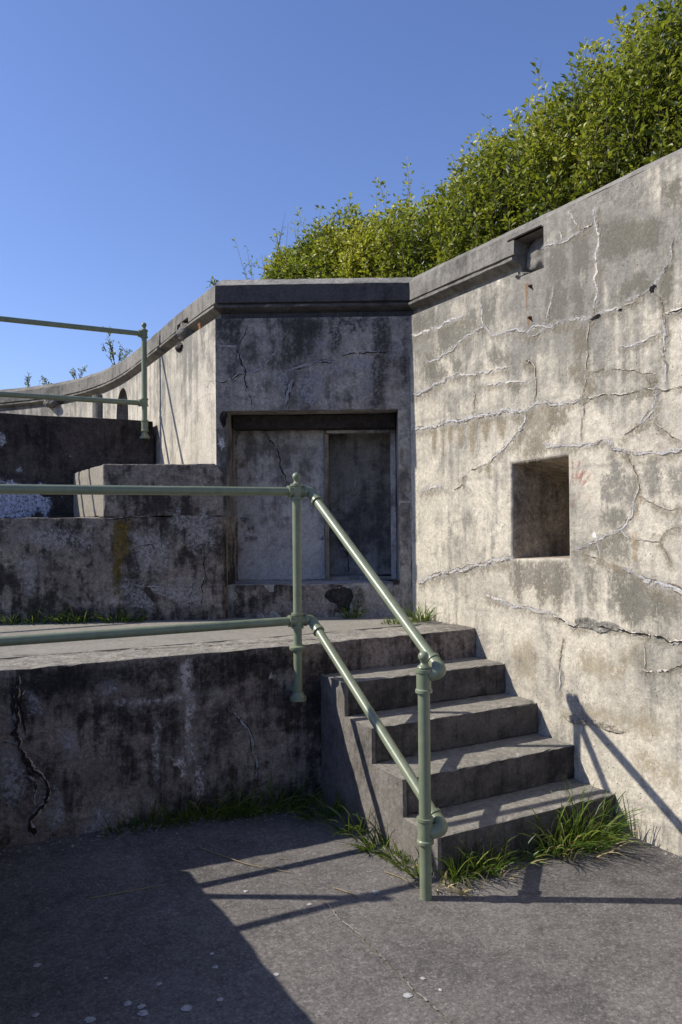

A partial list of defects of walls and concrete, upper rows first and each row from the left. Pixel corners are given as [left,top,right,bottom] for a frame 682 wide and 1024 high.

crack [207,328,389,409]
leakage [276,316,407,408]
crack [410,208,682,605]
leakage [114,529,204,611]
leakage [175,505,214,554]
spalling [324,586,365,612]
crack [418,556,682,697]
leakage [0,749,27,803]
crack [0,654,52,837]
leakage [29,654,292,798]